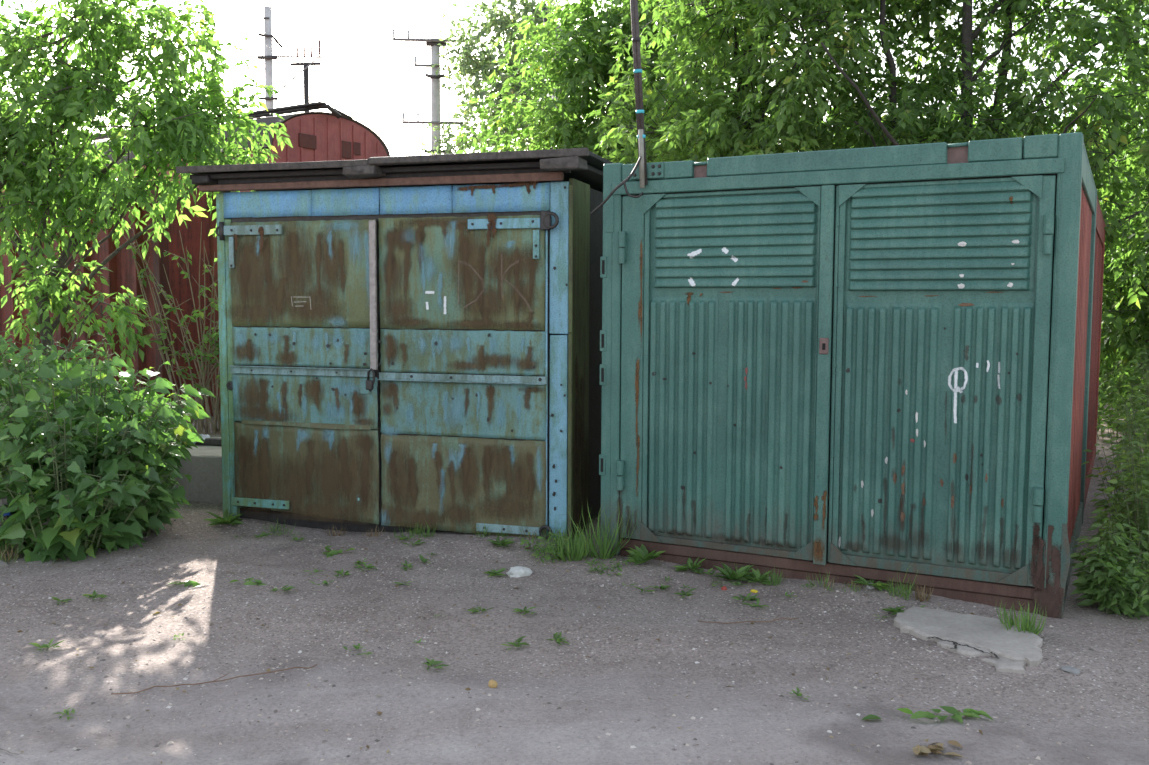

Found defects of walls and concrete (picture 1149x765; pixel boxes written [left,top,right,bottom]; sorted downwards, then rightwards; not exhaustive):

rust [230,227,345,324]
rust [384,213,538,366]
rust [236,339,255,359]
rust [281,335,296,365]
rust [454,345,536,370]
rust [382,382,398,415]
rust [486,387,494,421]
rust [524,387,539,409]
rust [237,379,376,522]
rust [385,446,534,527]
rust [1031,525,1064,619]